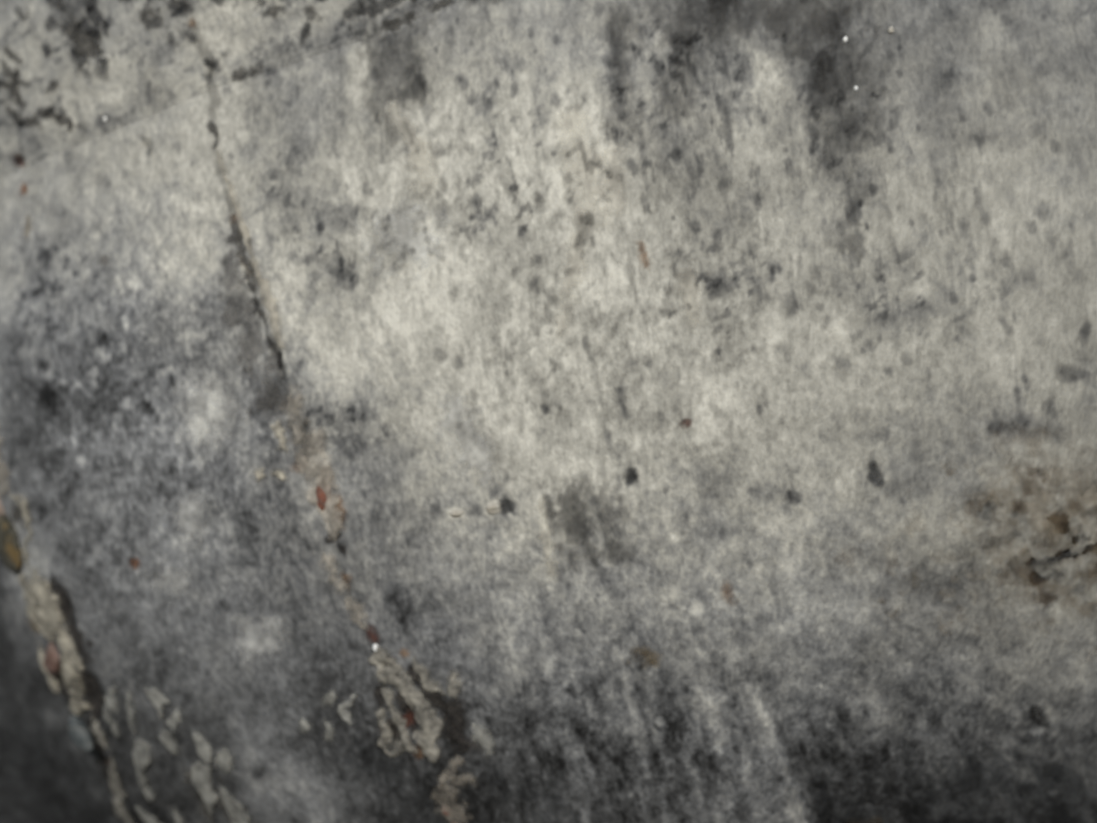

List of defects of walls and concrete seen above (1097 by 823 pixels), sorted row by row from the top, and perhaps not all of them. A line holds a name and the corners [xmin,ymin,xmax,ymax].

crack [207,123,283,370]
spalling [0,463,181,823]
peeling [184,733,250,823]
spalling [219,237,494,823]